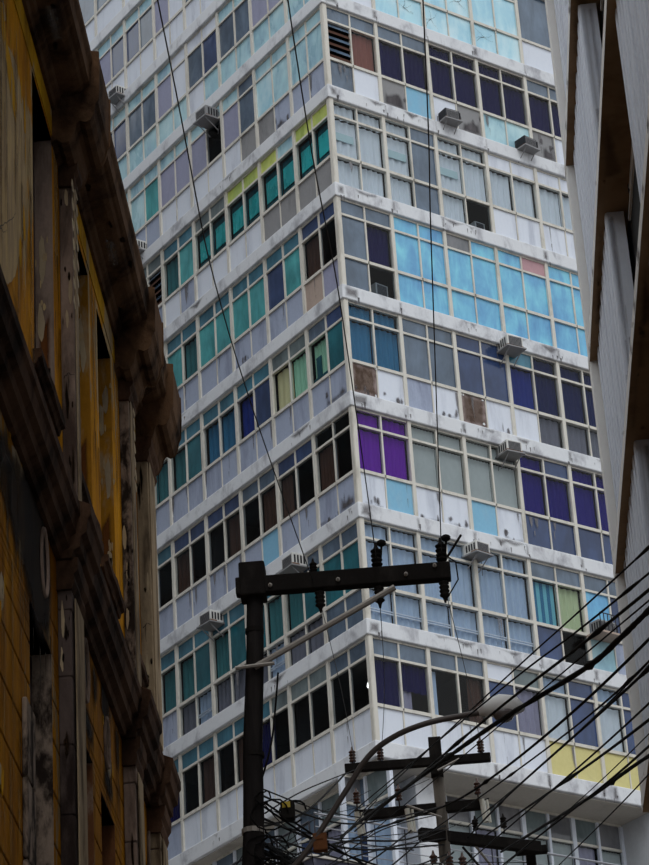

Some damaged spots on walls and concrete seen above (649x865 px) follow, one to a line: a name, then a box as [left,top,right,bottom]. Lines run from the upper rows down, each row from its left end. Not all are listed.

peeling [0,0,26,284]